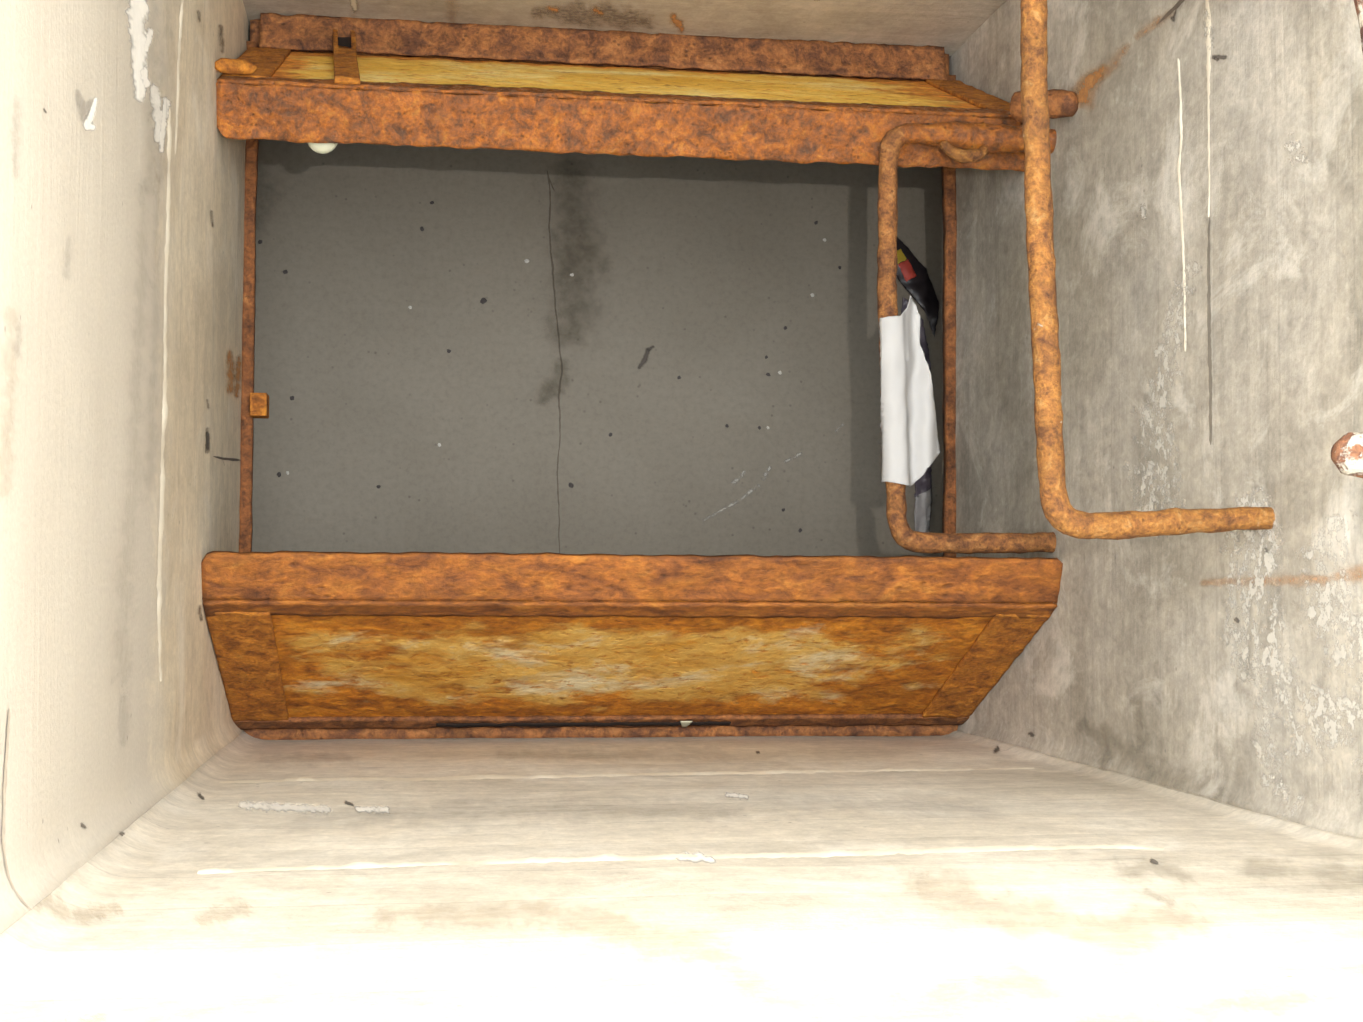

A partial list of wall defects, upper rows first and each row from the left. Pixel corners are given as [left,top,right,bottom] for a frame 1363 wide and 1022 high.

spalling [84,97,97,130]
peeling [126,0,170,153]
rust [1076,48,1125,104]
crack [547,171,563,553]